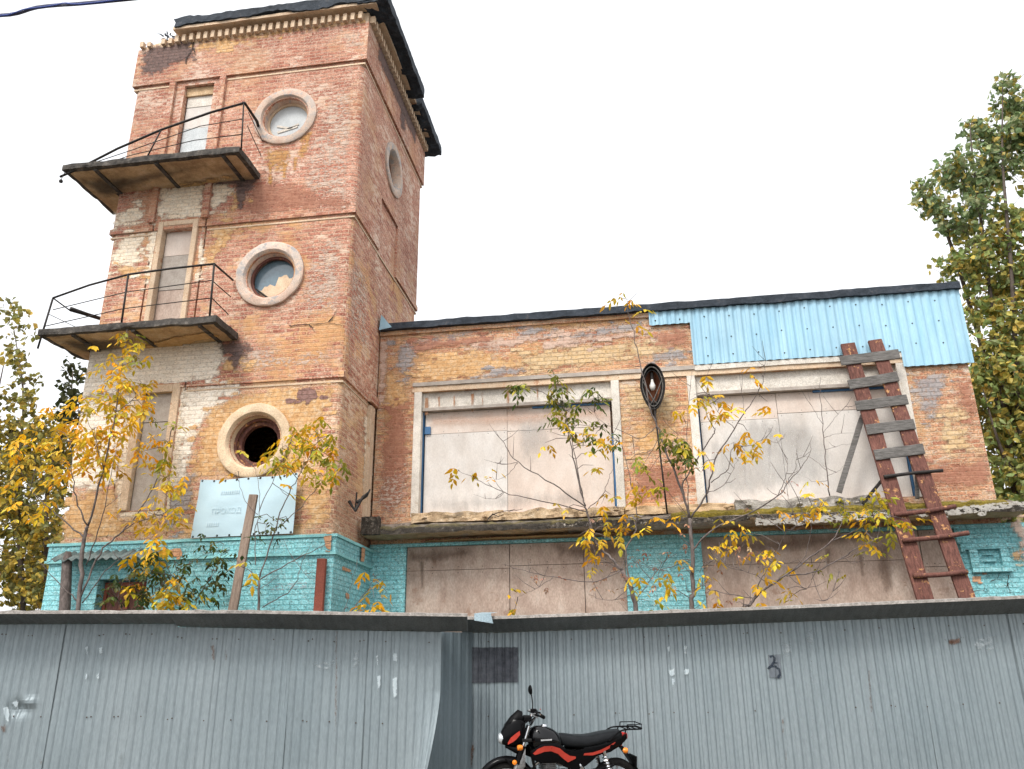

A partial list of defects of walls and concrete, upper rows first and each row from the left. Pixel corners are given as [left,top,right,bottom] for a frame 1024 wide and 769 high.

peeling [107,171,350,291]
peeling [62,341,337,559]
leakage [218,341,328,380]
peeling [362,321,693,520]
spalling [411,385,880,524]